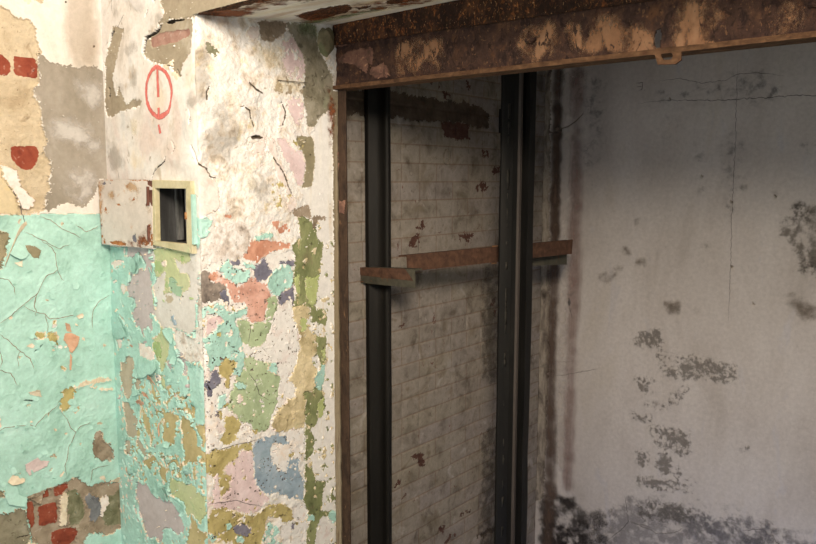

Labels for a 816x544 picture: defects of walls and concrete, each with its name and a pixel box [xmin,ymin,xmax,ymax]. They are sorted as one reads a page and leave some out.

rust [197,0,430,21]
rust [335,44,390,79]
crack [639,63,811,321]
water stain [784,208,816,271]
crack [0,184,108,383]
crack [1,399,91,475]
water stain [539,496,607,544]